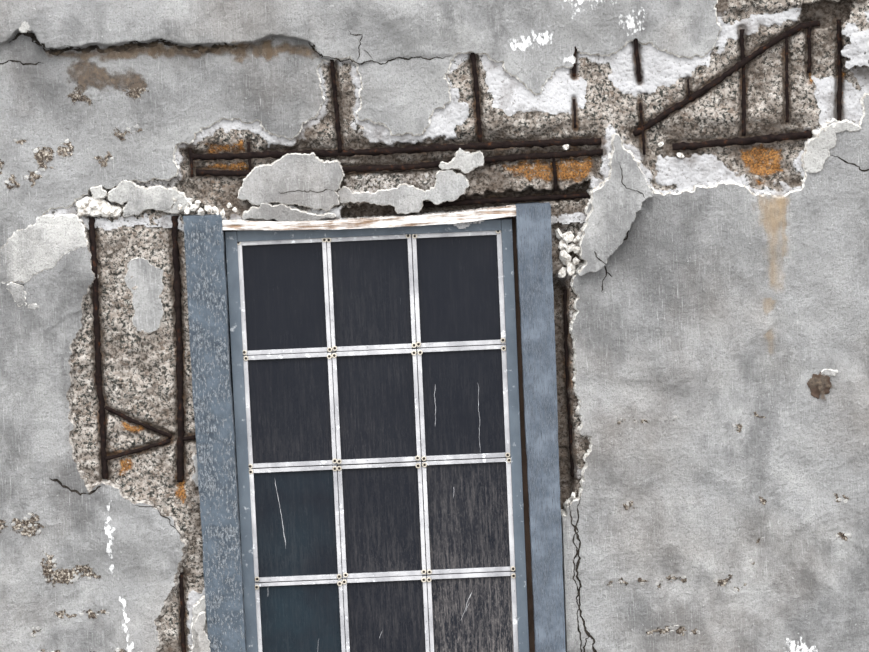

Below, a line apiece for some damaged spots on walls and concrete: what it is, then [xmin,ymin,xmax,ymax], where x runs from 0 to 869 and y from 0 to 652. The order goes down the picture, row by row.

crack [0,32,250,65]
rust [208,139,249,170]
rust [496,156,592,182]
rust [741,144,783,185]
crack [830,155,869,172]
spalling [0,0,869,517]
rust [123,422,144,433]
spalling [66,198,211,652]
crack [569,493,597,652]
peeling [54,609,109,621]